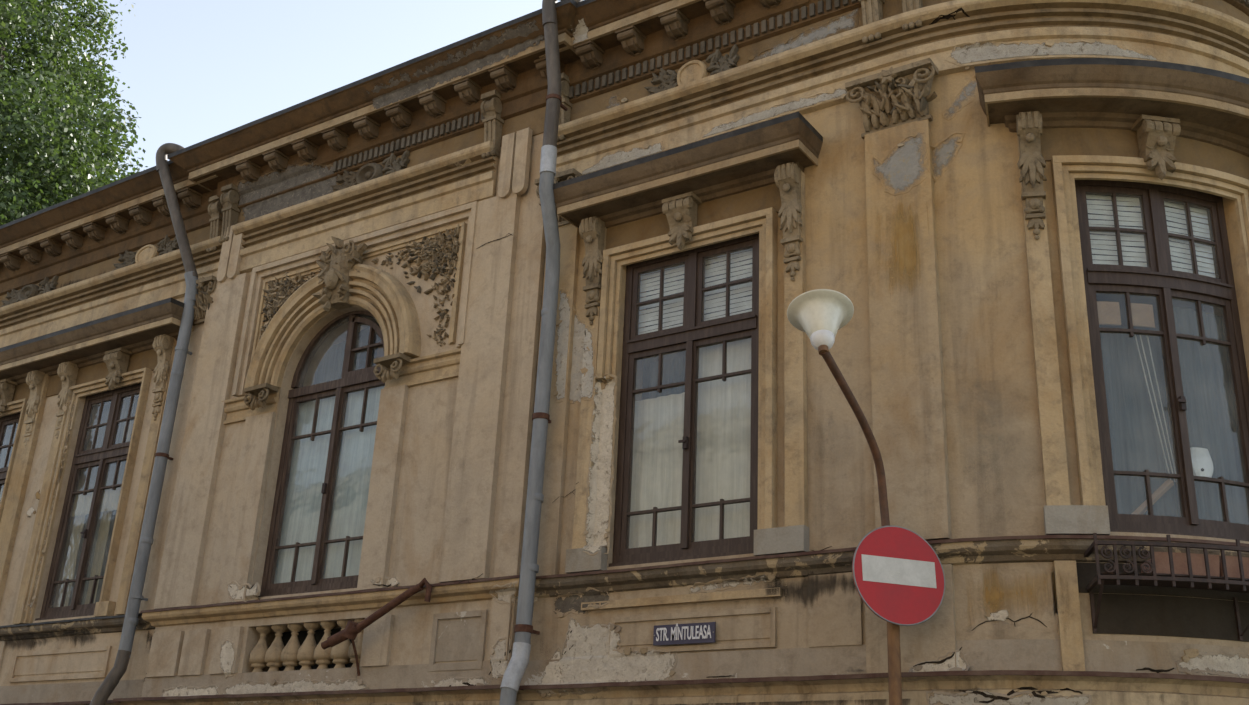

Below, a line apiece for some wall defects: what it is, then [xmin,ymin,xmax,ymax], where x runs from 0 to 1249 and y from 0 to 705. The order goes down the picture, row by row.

spalling [945,40,1158,72]
peeling [872,132,965,196]
spalling [552,288,617,556]
spalling [160,639,369,705]
spalling [431,634,511,687]
spalling [536,587,678,698]
spalling [908,647,1092,705]
crack [973,612,1047,630]
spalling [1175,649,1249,678]